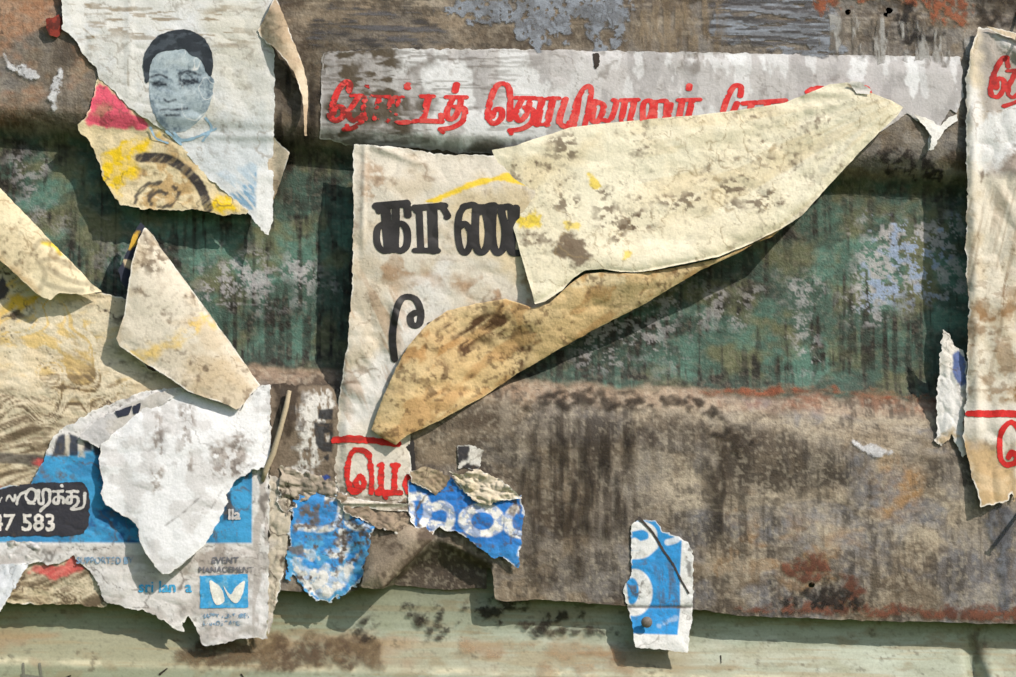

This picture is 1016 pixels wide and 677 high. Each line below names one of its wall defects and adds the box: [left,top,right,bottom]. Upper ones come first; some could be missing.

peeling [307,4,446,51]
peeling [444,0,636,53]
rust [813,0,839,17]
rust [905,0,968,26]
rust [726,386,803,395]
damp [525,387,754,453]
damp [551,433,626,536]
damp [987,506,1016,610]